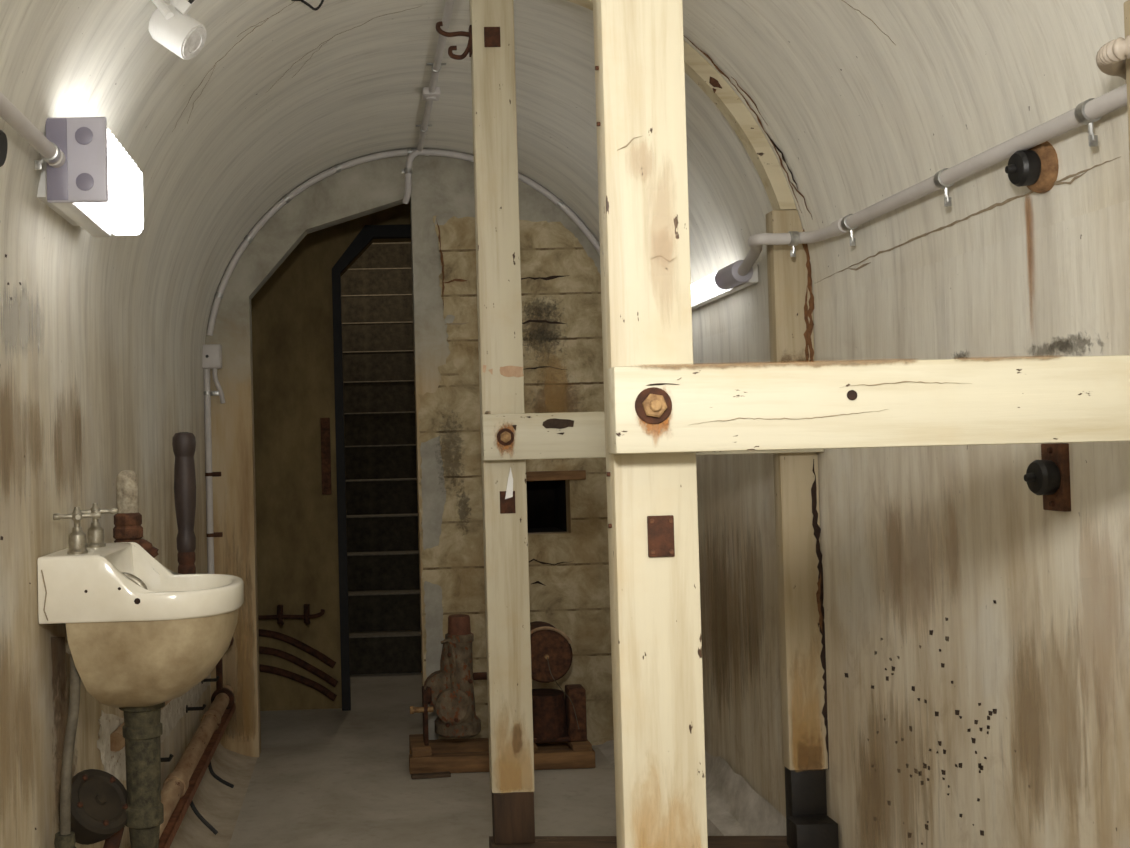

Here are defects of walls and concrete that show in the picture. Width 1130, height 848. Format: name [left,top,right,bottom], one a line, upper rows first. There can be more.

crack [683,35,1119,361]
corrosion [640,415,670,435]